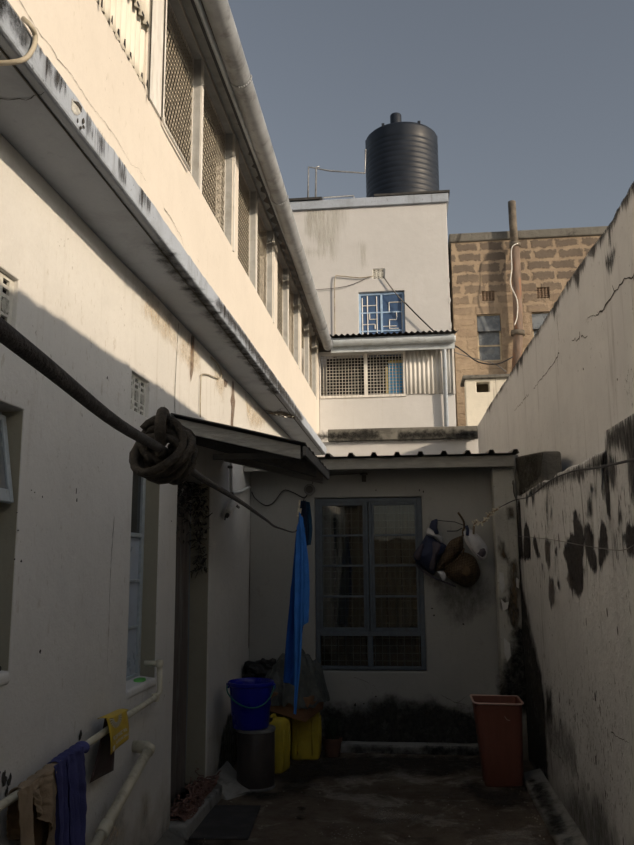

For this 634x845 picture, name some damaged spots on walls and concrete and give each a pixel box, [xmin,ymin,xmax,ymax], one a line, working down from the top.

water stain [0,0,29,45]
water stain [40,47,66,89]
crack [515,275,634,410]
water stain [515,414,634,519]
water stain [244,696,480,799]